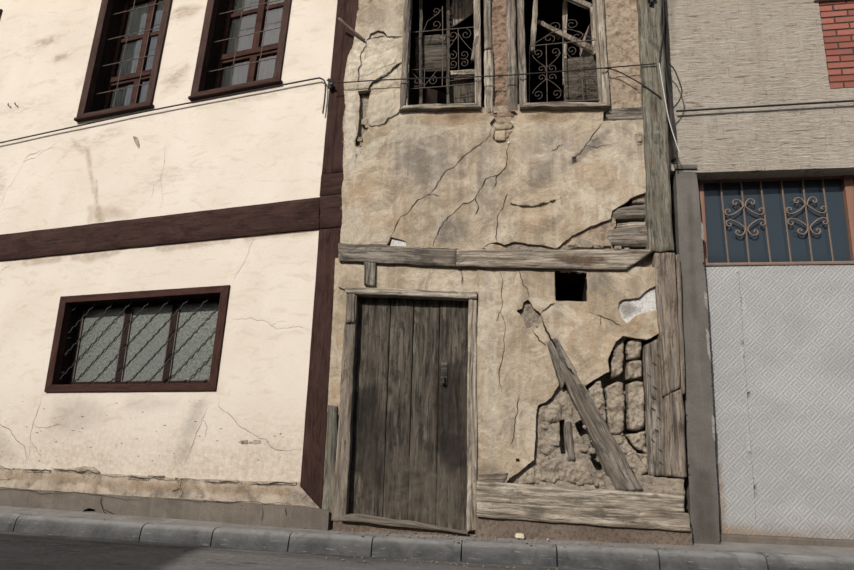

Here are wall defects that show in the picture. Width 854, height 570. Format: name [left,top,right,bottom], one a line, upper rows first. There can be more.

crack [357,30,402,93]
crack [370,111,399,127]
crack [554,120,612,159]
crack [388,124,555,247]
flaking render [483,194,648,250]
flaking render [517,301,542,328]
flaking render [618,287,656,323]
crack [497,269,579,445]
flaking render [478,336,685,496]
crack [1,401,140,514]
crack [152,392,321,522]